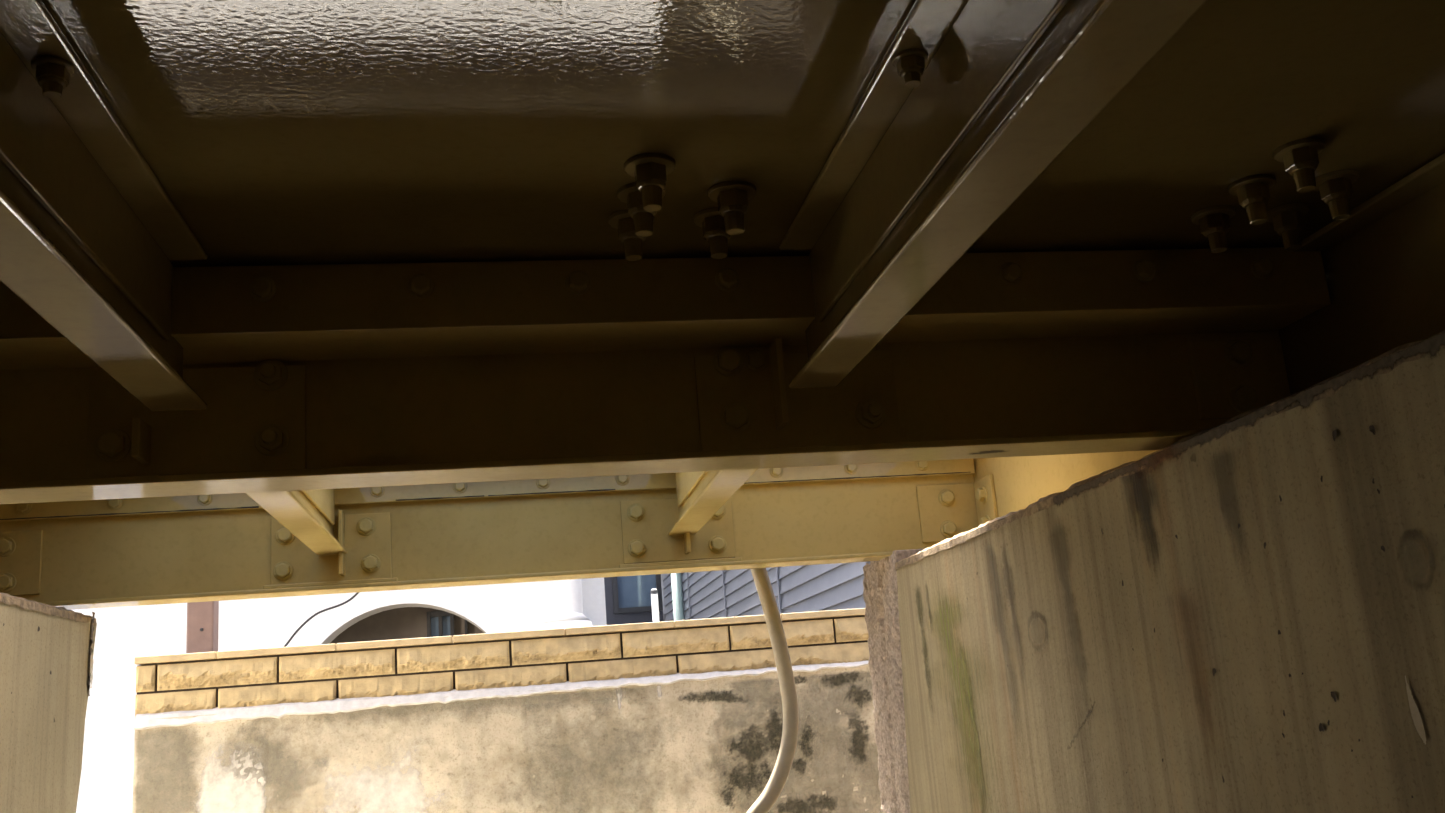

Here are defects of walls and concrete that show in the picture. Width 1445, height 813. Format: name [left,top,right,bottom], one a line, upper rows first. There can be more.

leakage [1124,470,1157,560]
leakage [684,672,881,813]